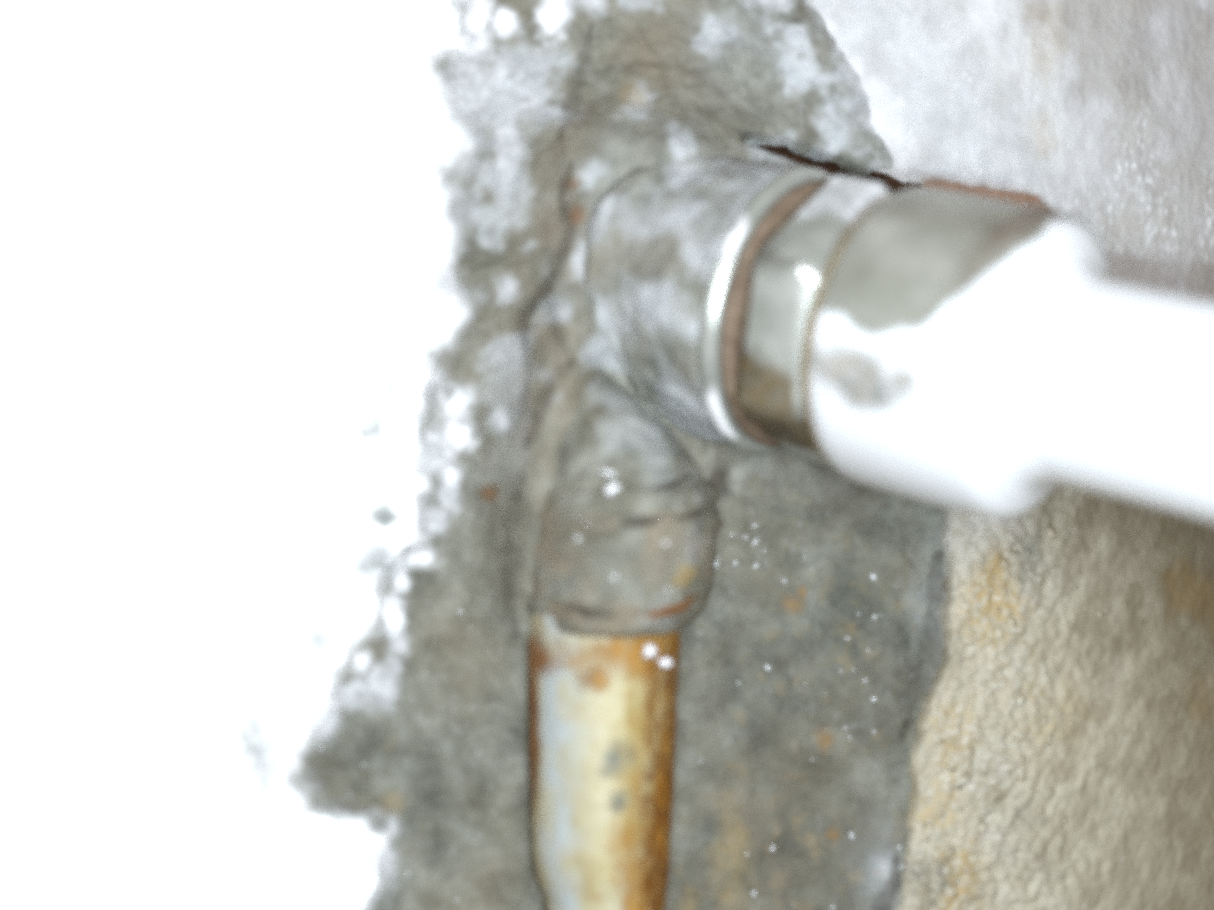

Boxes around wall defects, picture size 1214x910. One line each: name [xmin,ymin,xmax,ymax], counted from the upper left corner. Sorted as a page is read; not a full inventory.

peeling [441,0,538,173]
peeling [535,0,604,41]
peeling [758,0,791,11]
peeling [499,281,515,301]
peeling [416,365,479,532]
peeling [491,412,508,430]
peeling [333,550,434,705]
rust [528,639,547,796]
rust [591,630,680,910]